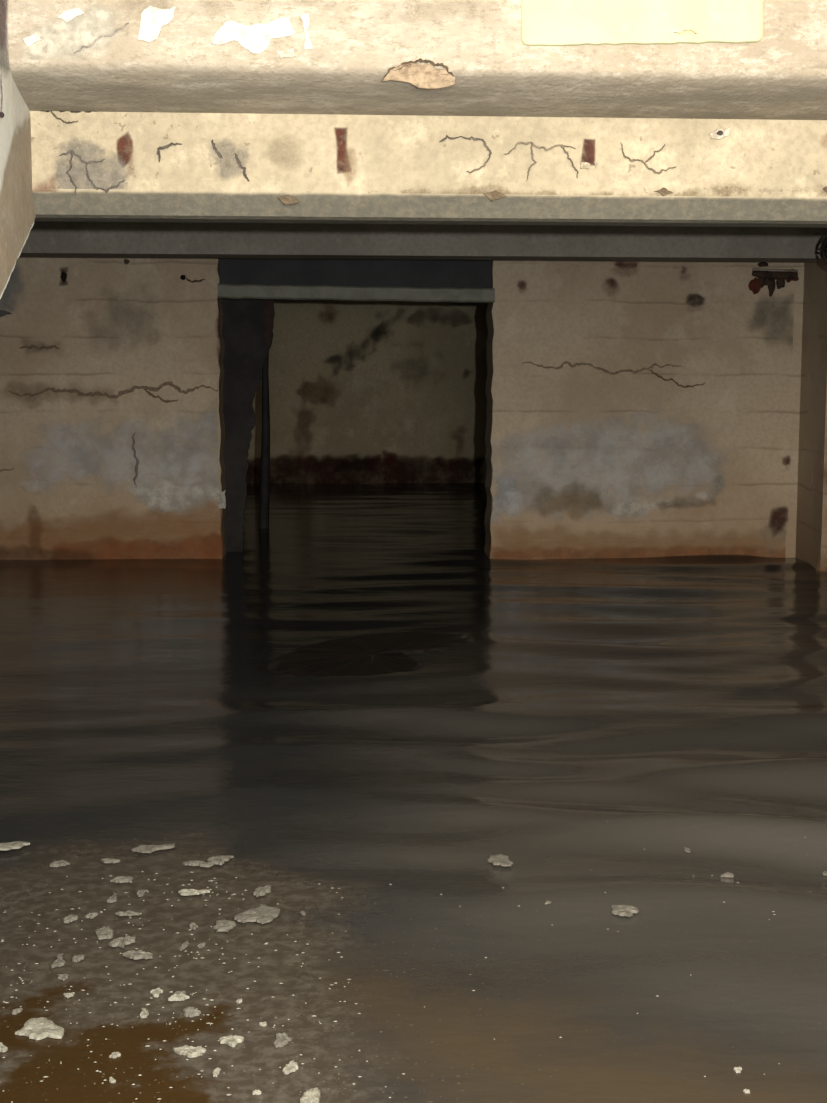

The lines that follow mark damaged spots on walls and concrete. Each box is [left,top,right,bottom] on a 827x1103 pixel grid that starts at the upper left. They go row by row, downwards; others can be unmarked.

peeling [0,0,9,71]
peeling [23,6,176,58]
peeling [211,13,313,58]
corrosion [117,134,132,166]
corrosion [335,128,351,172]
crack [440,135,579,179]
crack [621,143,675,174]
crack [20,343,60,351]
crack [8,381,218,403]
crack [522,361,705,388]
leakage [51,417,219,510]